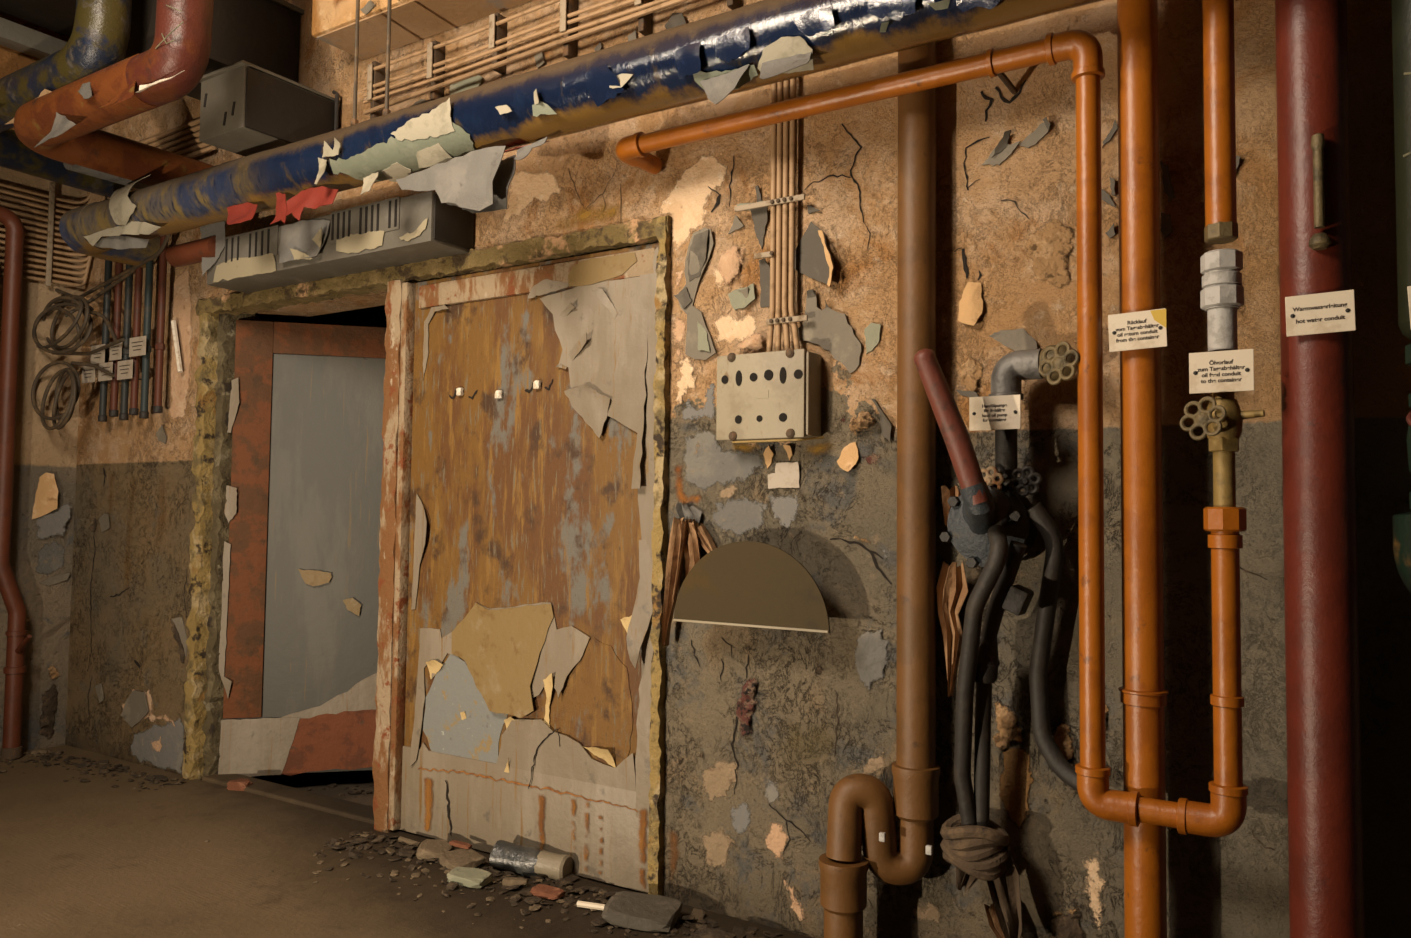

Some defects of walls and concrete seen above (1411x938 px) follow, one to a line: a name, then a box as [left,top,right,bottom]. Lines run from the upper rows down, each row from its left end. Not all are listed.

peeling [795,205,881,374]
peeling [32,472,71,586]
corrosion [223,320,386,719]
peeling [410,156,806,869]